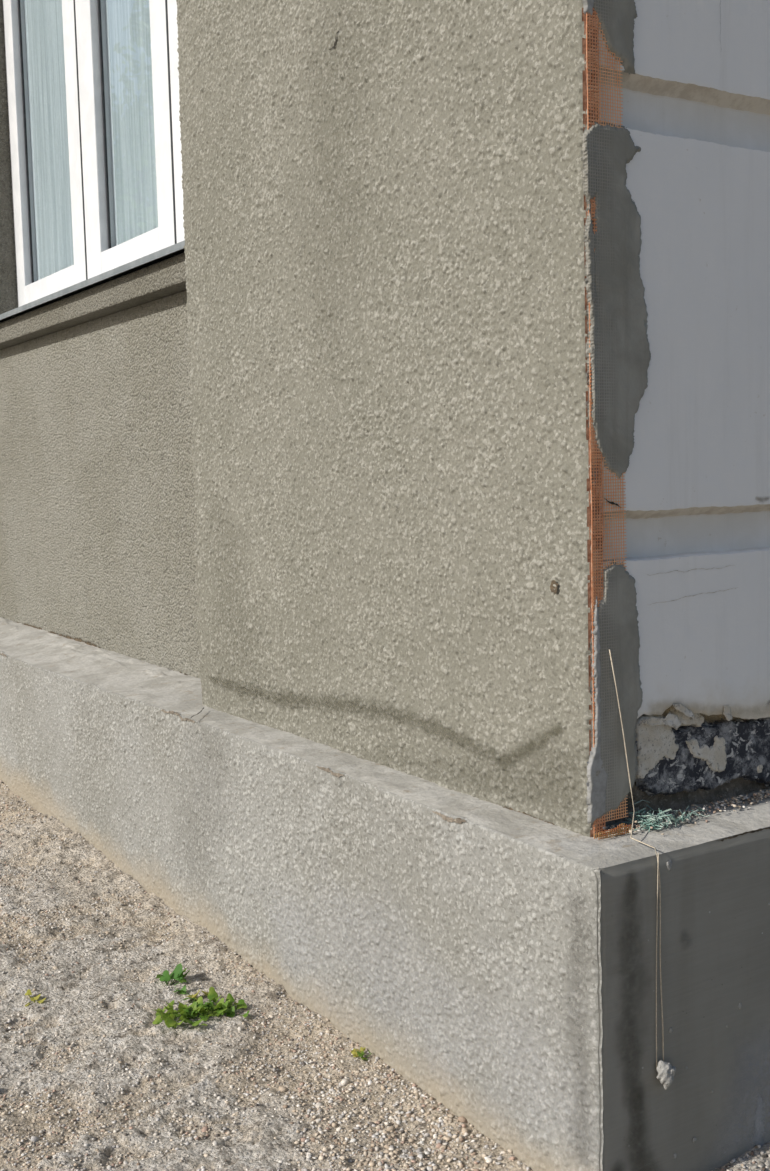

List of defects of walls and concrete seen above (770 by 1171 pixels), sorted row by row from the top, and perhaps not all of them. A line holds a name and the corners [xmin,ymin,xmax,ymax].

peeling [635,703,727,779]